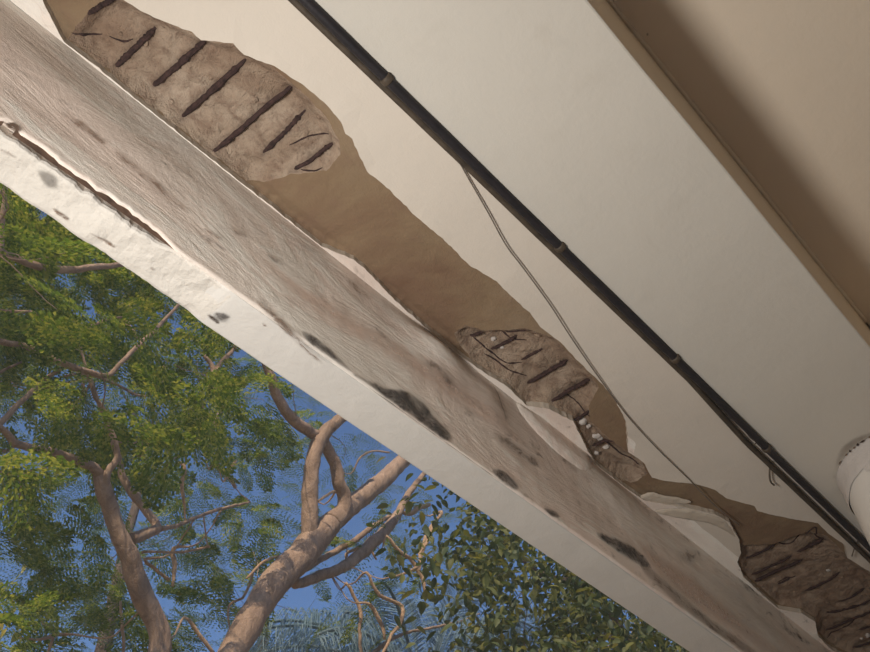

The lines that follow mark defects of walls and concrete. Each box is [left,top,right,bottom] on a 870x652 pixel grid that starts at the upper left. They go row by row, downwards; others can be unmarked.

spalling [47,0,554,358]
water stain [371,383,449,440]
water stain [601,534,648,567]
spalling [454,325,870,652]